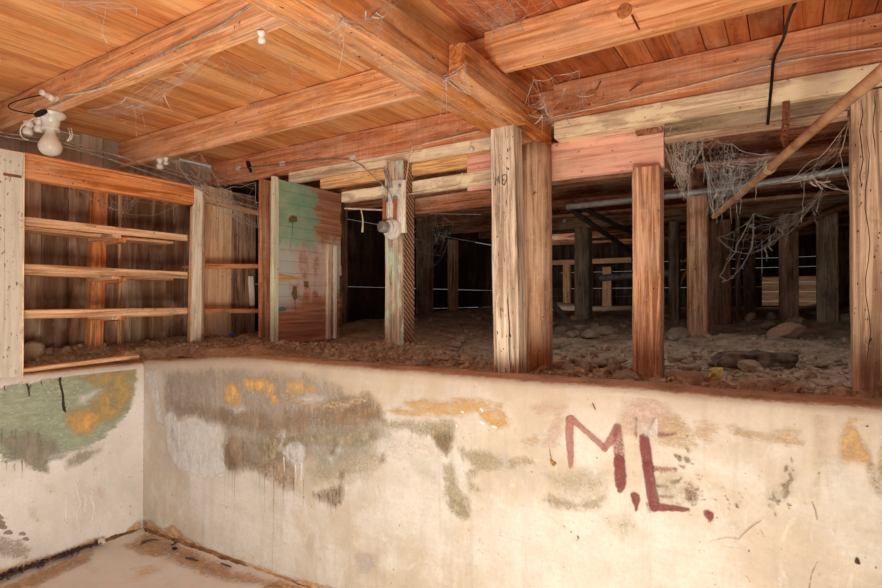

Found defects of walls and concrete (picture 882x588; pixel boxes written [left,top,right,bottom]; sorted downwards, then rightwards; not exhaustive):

damp [146,370,453,505]
damp [444,450,516,517]